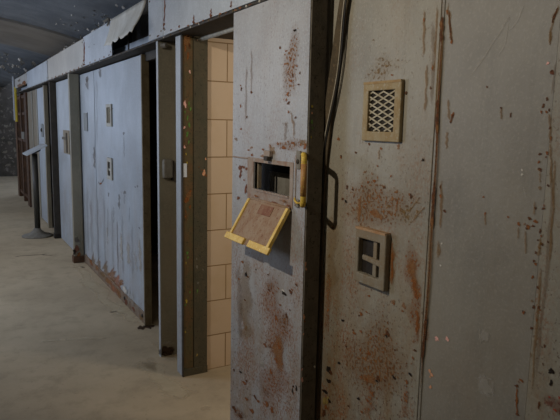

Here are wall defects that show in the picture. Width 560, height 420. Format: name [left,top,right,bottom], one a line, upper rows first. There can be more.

rust [279,22,300,113]
rust [340,10,453,419]
rust [105,269,135,312]
rust [245,267,298,413]